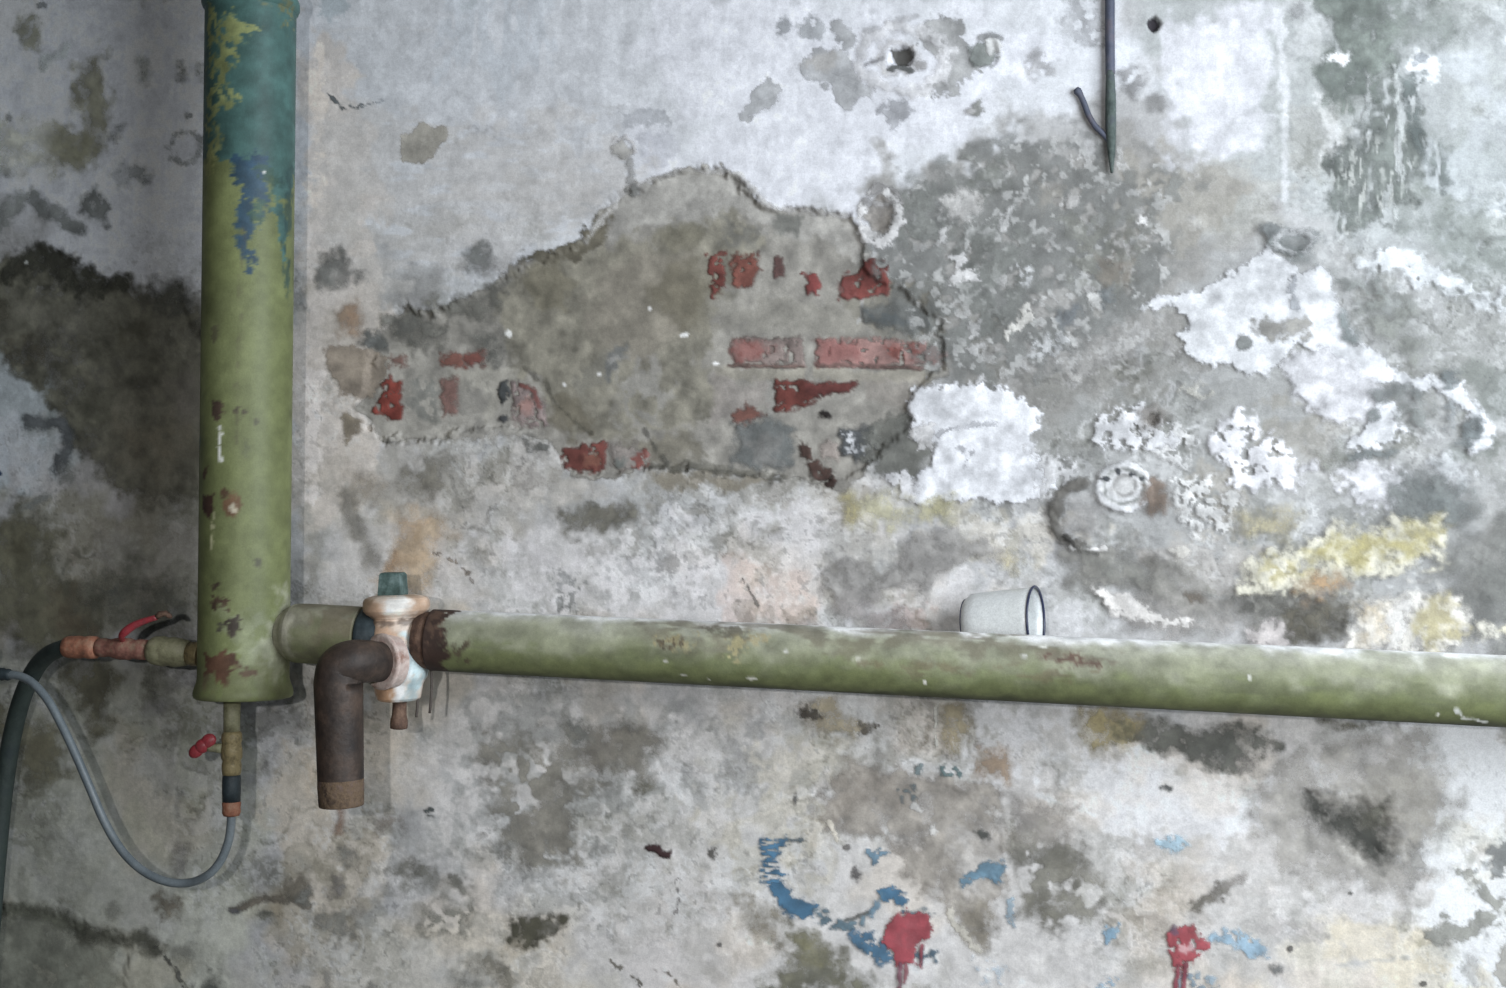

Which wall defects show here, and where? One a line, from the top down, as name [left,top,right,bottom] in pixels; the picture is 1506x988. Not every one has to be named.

damp [1314,0,1457,232]
damp [0,242,201,510]
spalling [326,131,1506,510]
peeling [1092,401,1318,540]
damp [1320,449,1397,471]
damp [1336,277,1434,365]
damp [1368,371,1485,451]
damp [823,495,1013,629]
damp [1058,463,1506,655]